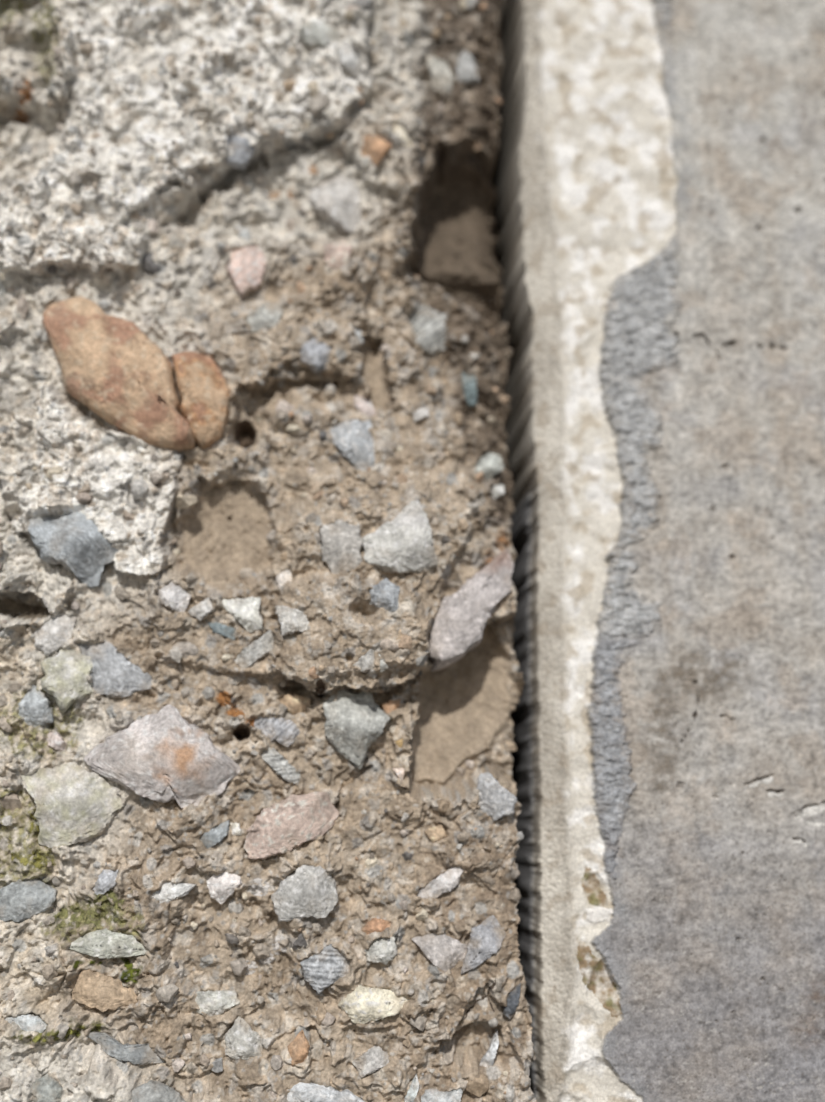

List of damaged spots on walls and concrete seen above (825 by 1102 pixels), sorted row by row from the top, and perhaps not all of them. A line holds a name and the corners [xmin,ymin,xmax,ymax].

spalling [543,0,684,1102]
crack [743,775,825,848]